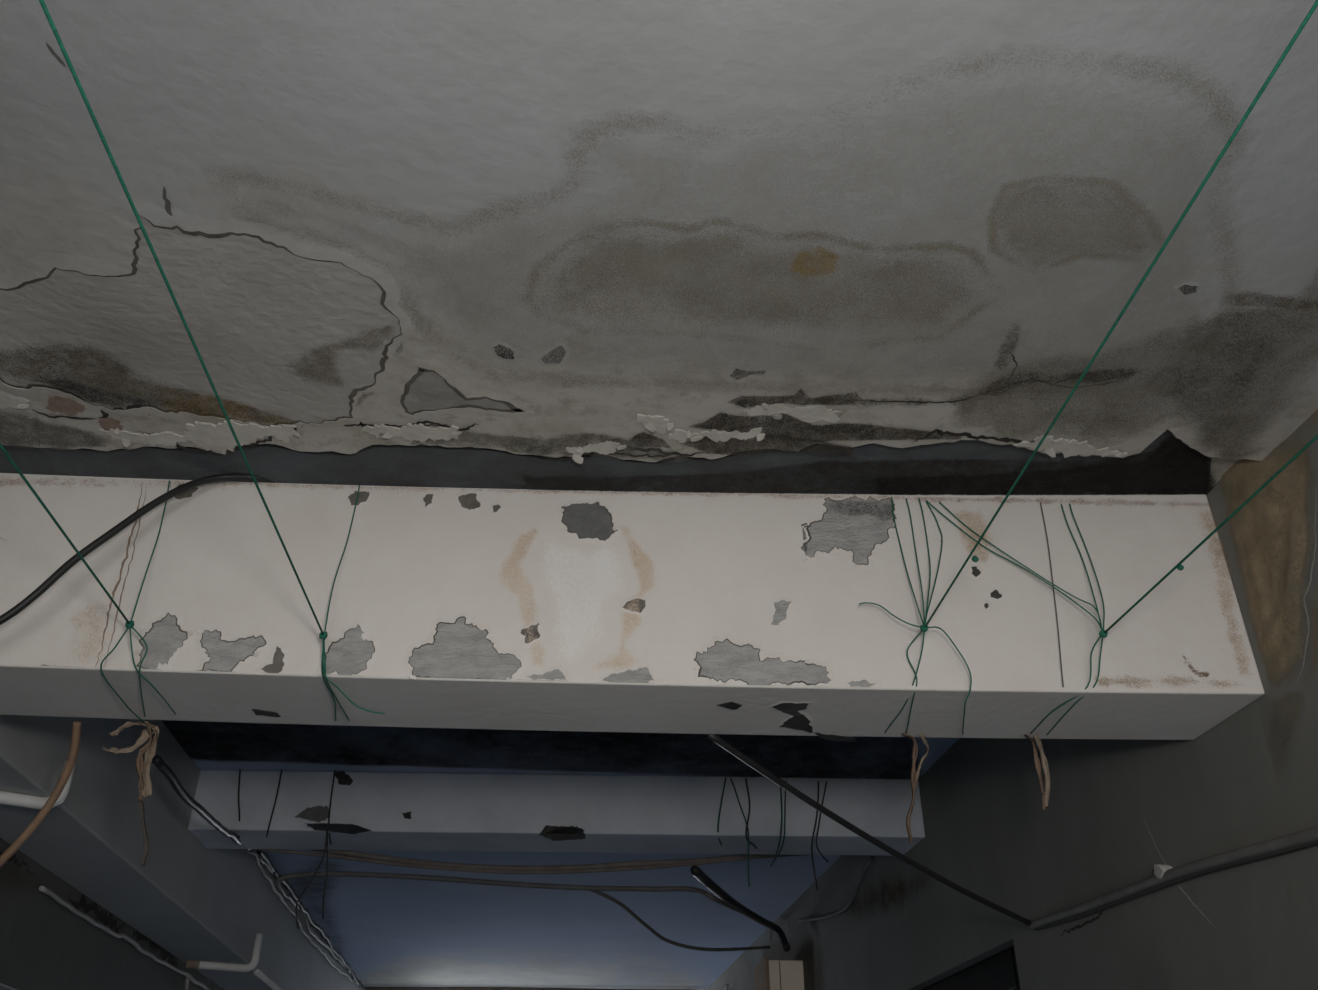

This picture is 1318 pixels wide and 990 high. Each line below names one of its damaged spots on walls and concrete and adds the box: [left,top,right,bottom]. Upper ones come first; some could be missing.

leakage [0,341,203,409]
peeling [0,197,1218,572]
leakage [0,410,118,451]
peeling [130,608,289,673]
peeling [315,620,381,676]
peeling [402,611,570,681]
peeling [766,596,796,630]
peeling [688,633,883,742]